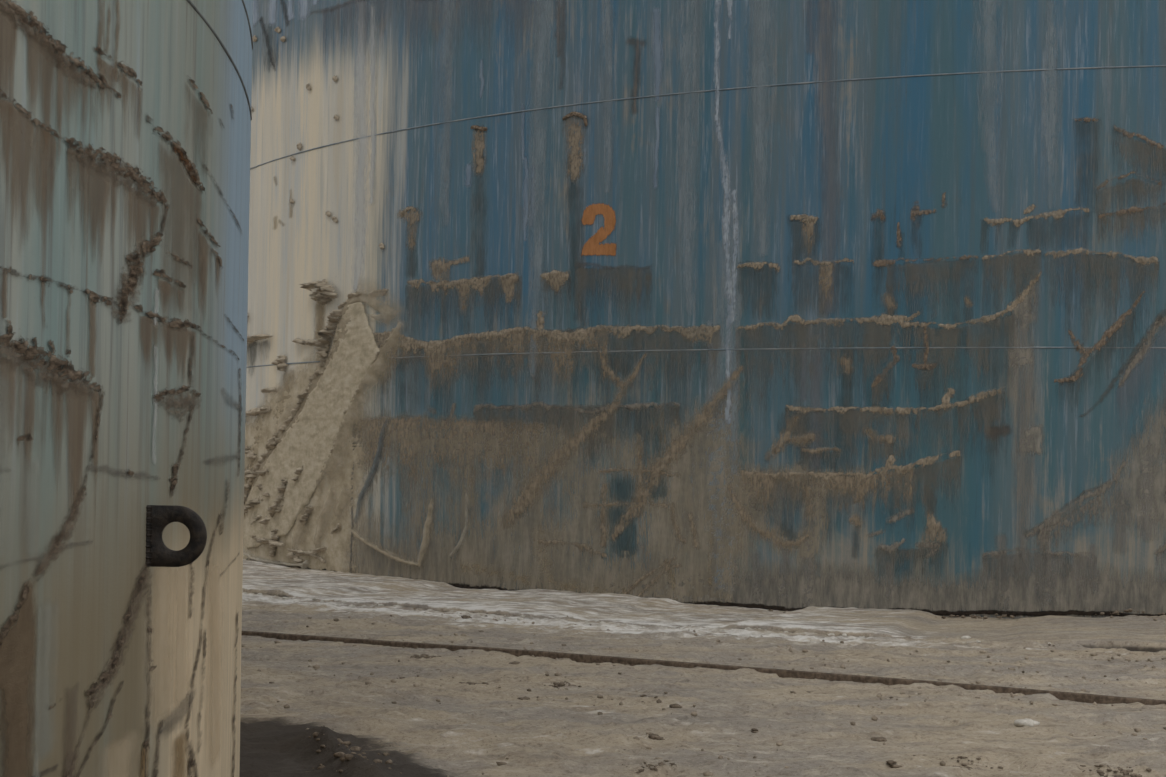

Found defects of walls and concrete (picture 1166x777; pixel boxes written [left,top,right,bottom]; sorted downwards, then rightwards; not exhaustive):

damp [0,3,140,237]
corrosion [471,125,487,173]
damp [714,0,732,142]
damp [52,379,99,504]
crack [3,210,168,575]
peeling [407,257,518,310]
peeling [373,311,720,387]
damp [709,156,740,326]
peeling [738,272,1041,369]
peeling [872,192,1166,267]
crack [141,318,244,777]
crack [35,565,157,777]